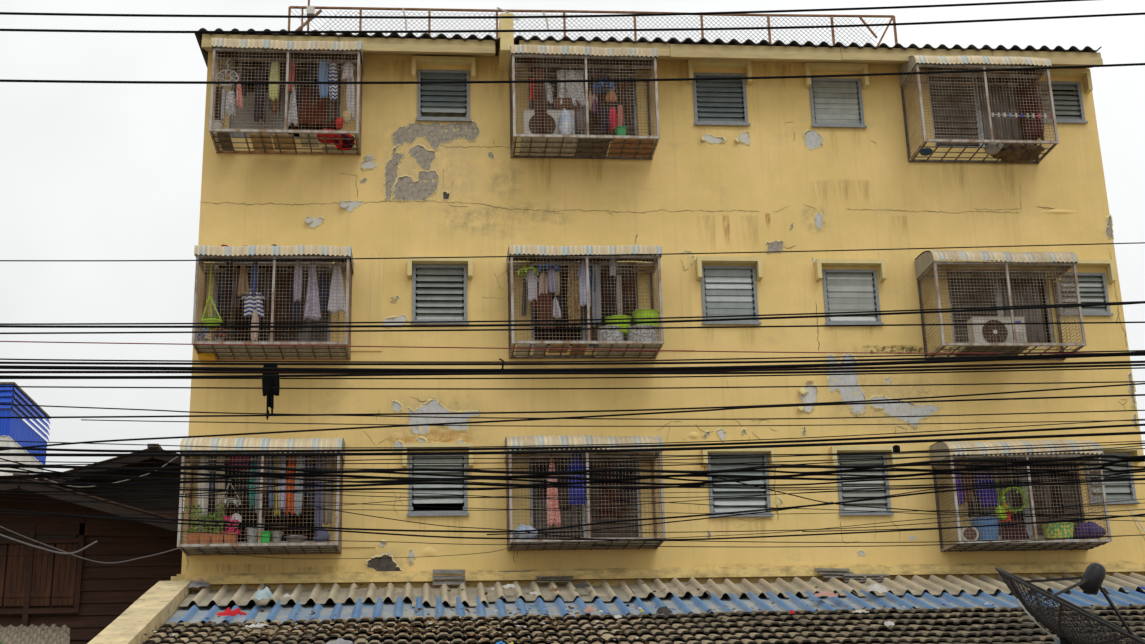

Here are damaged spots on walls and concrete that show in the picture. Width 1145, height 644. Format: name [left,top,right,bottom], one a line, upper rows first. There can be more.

peeling [701,131,751,146]
peeling [802,129,824,151]
spalling [359,120,481,203]
peeling [305,216,325,229]
peeling [339,200,364,213]
peeling [798,353,941,436]
peeling [391,399,481,452]
spalling [365,539,416,571]